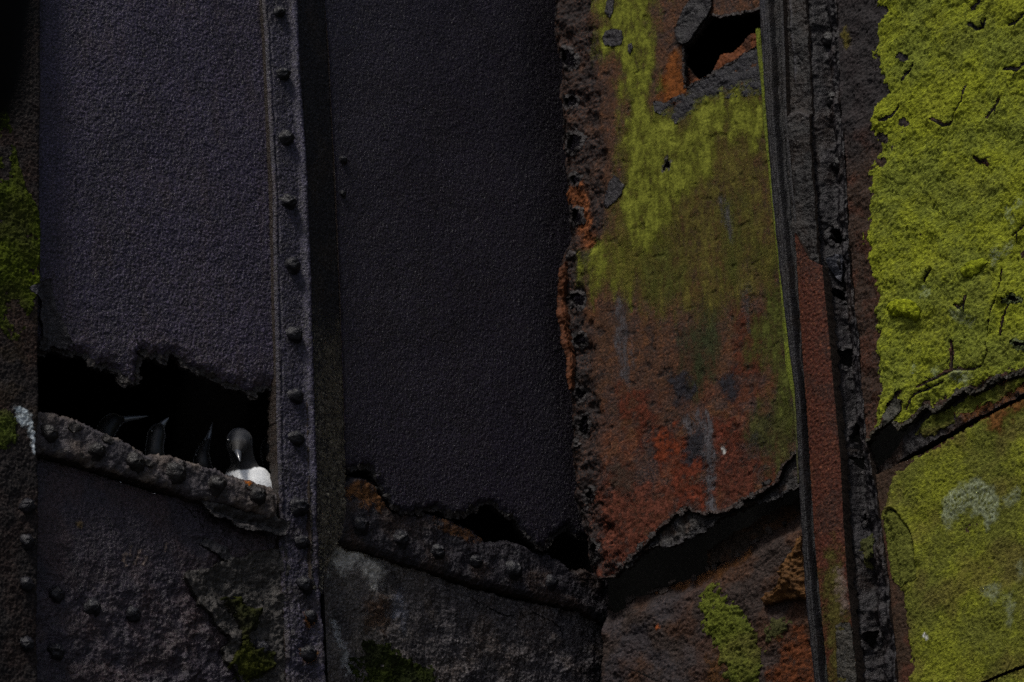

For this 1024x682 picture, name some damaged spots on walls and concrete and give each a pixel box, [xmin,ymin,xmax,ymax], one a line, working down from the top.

peeling [674,0,713,44]
corrosion [566,182,596,248]
corrosion [556,261,577,391]
corrosion [594,422,706,577]
corrosion [760,535,806,607]